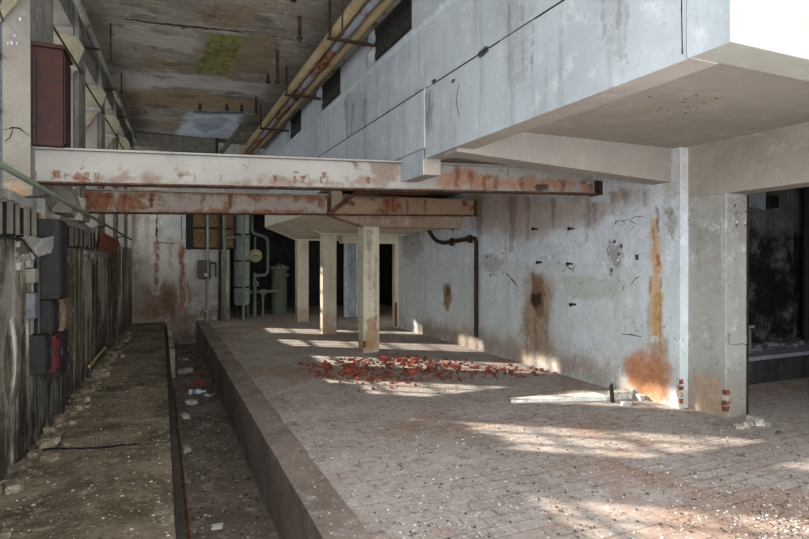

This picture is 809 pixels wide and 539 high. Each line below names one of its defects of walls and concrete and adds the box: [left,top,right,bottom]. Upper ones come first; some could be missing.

rust [51,162,403,214]
rust [175,240,188,316]
rust [441,279,454,314]
rust [645,212,668,340]